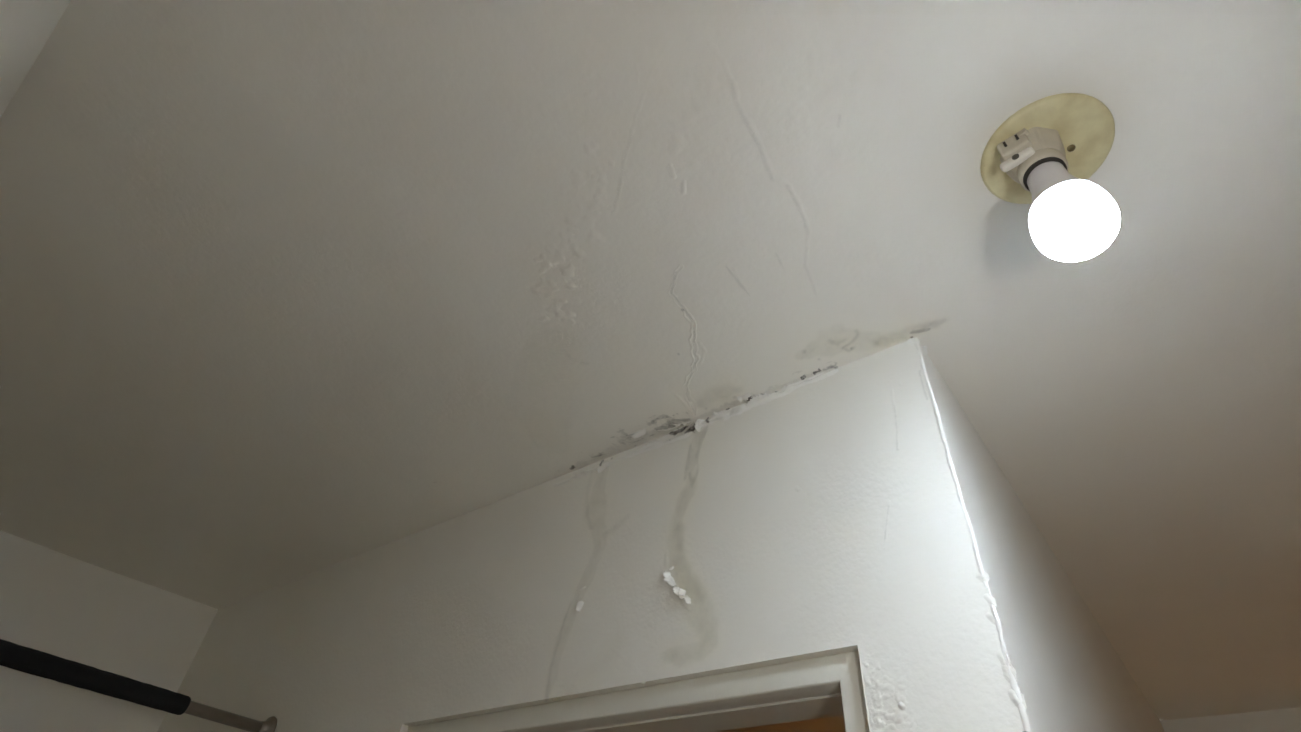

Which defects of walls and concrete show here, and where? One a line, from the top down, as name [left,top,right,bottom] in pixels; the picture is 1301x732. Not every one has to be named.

peeling [552,369,838,487]